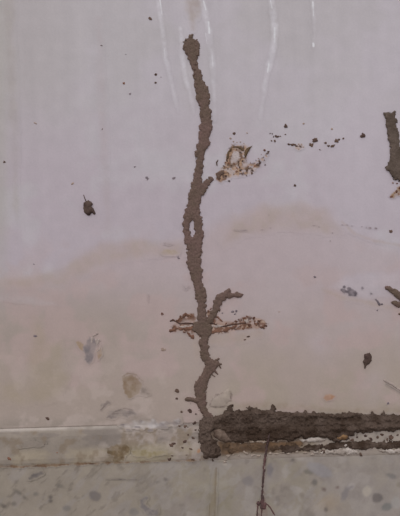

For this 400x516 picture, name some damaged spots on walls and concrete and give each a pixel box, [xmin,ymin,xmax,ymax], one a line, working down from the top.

peeling [214,132,270,184]